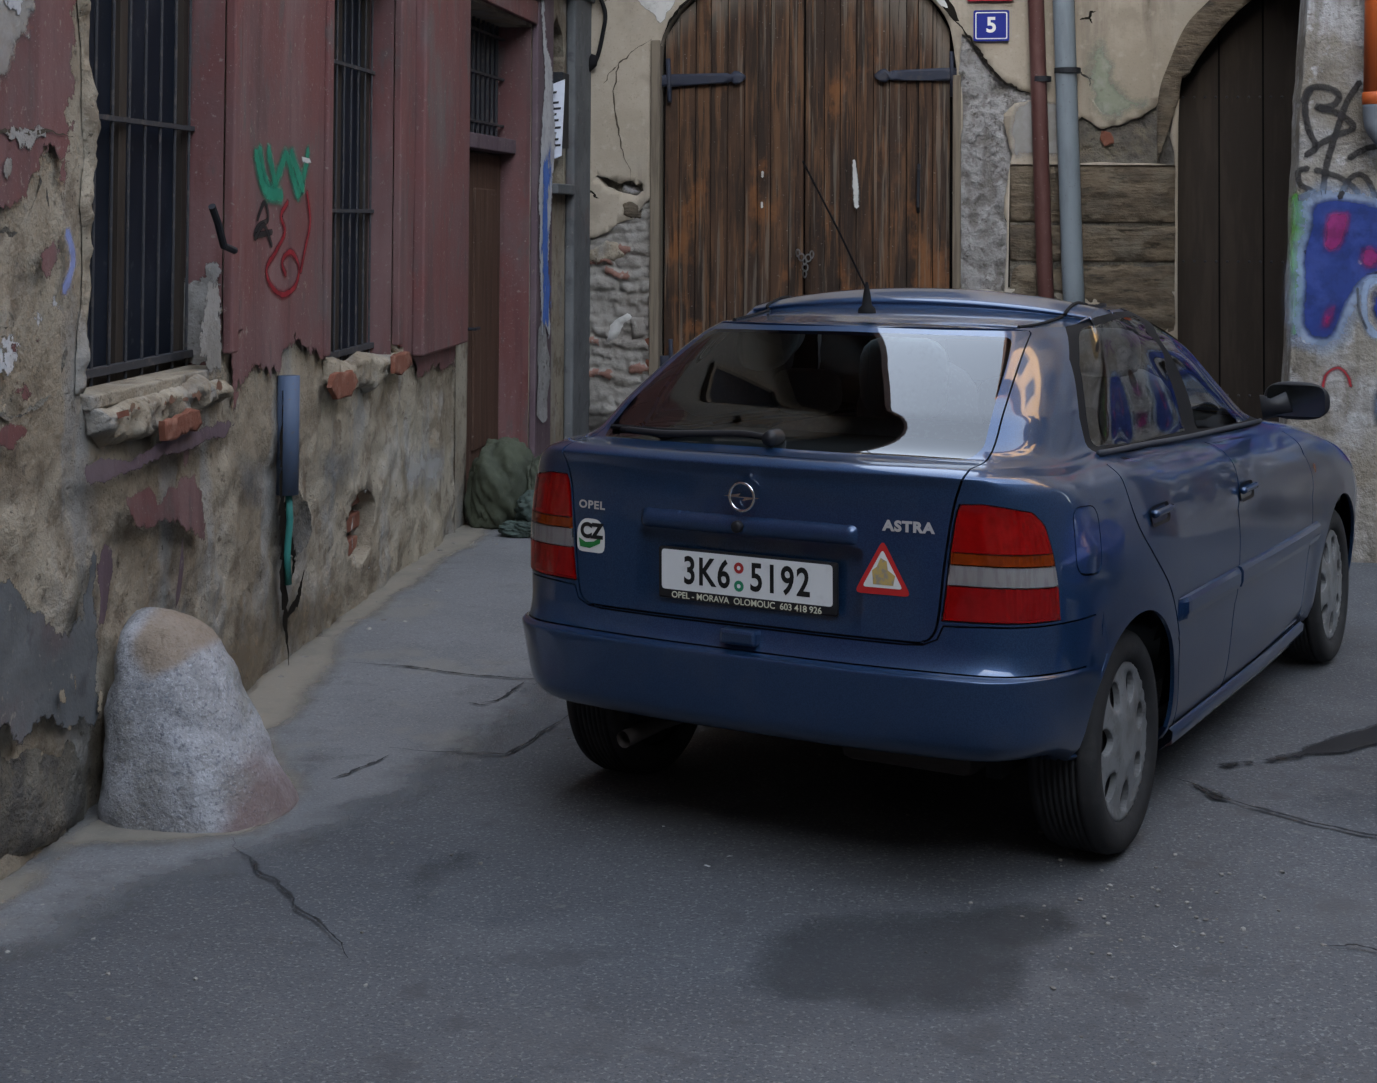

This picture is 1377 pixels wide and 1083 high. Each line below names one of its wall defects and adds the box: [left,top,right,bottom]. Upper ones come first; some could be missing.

crack [603,0,690,180]
crack [936,0,1031,94]
spalling [0,0,101,450]
flaking render [952,34,1031,292]
flaking render [116,261,223,441]
flaking render [327,370,359,400]
flaking render [589,176,650,433]
peeling [97,544,113,625]
peeling [126,474,206,609]
flaking render [285,491,312,560]
spalling [346,495,360,556]